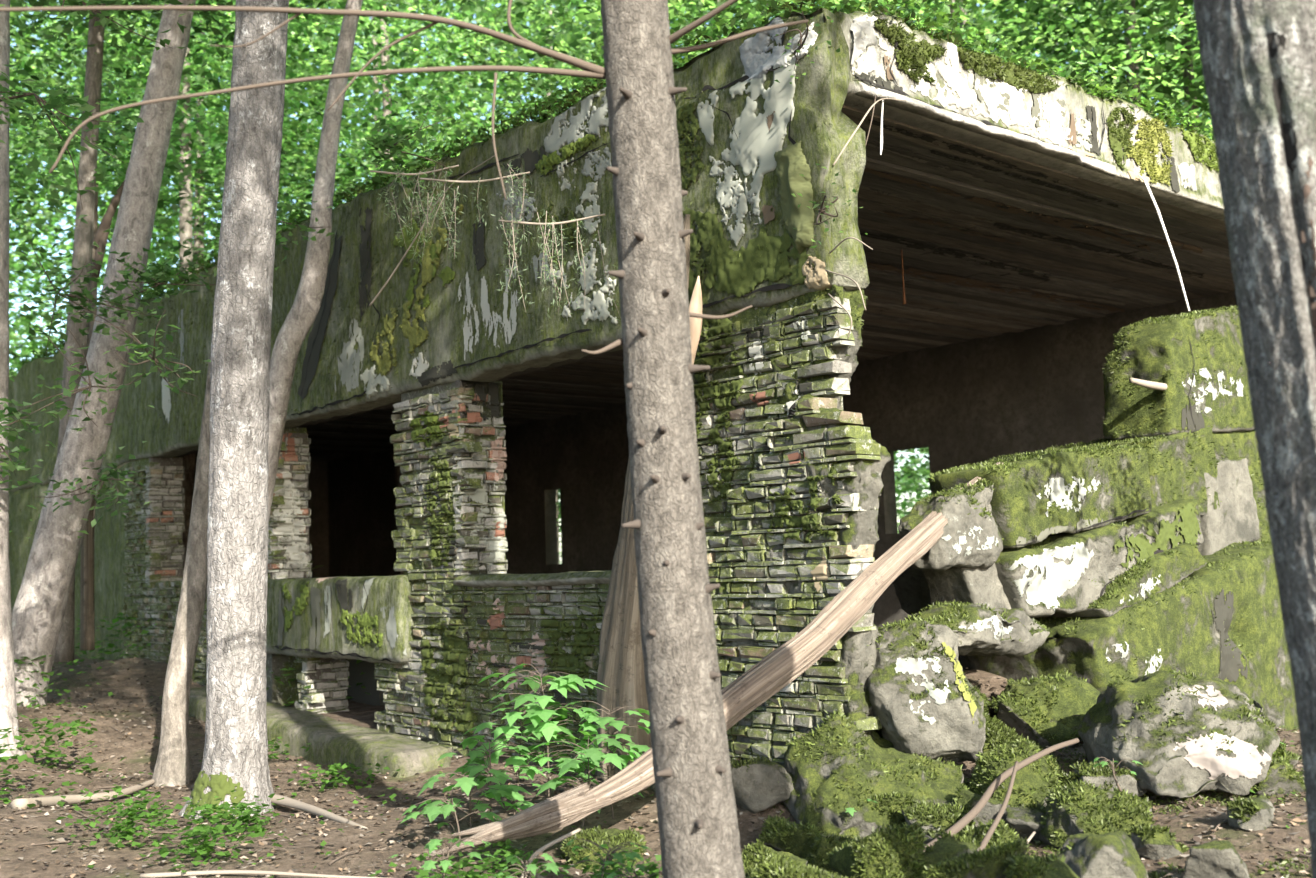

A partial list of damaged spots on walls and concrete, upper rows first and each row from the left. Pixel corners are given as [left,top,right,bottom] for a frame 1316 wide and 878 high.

peeling [850,28,888,75]
peeling [697,16,818,246]
peeling [909,42,1093,161]
peeling [544,87,618,325]
spalling [1128,171,1150,183]
peeling [1178,162,1197,191]
peeling [1007,542,1094,611]